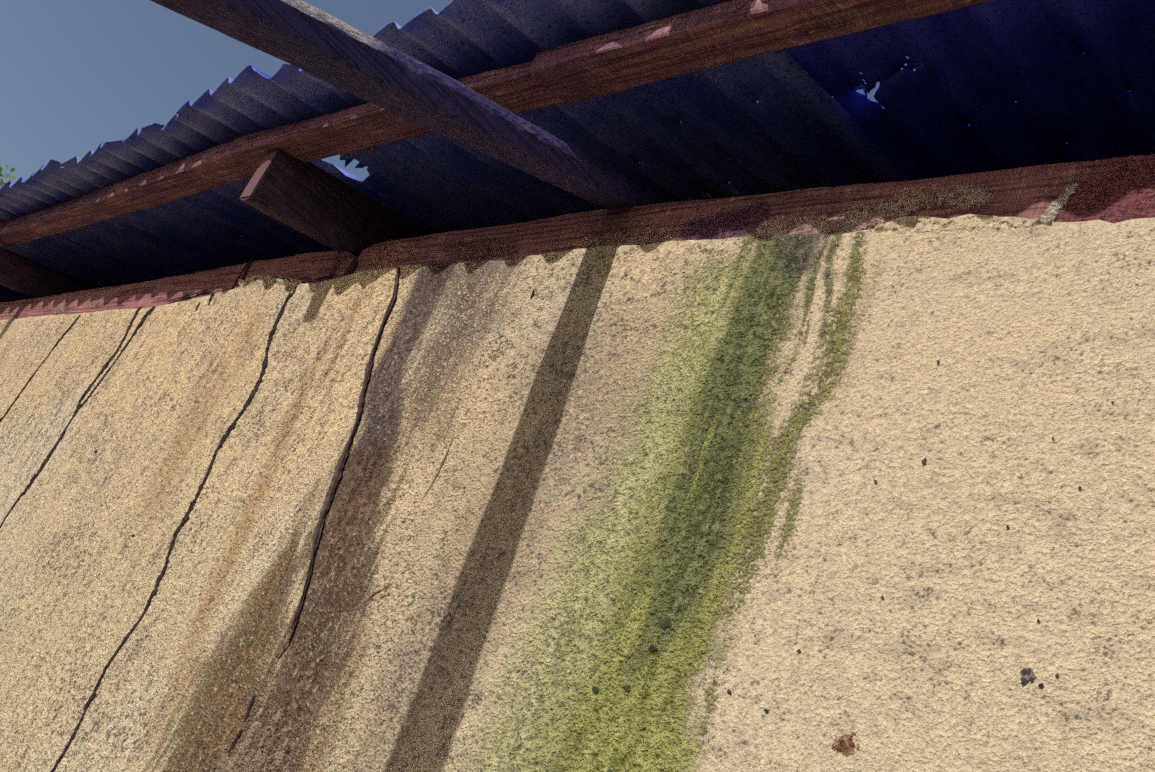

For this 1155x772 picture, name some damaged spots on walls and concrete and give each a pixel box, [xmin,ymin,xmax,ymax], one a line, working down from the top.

crack [0,289,214,527]
crack [50,258,357,772]
water stain [144,257,527,772]
crack [276,267,399,657]
water stain [536,200,866,772]